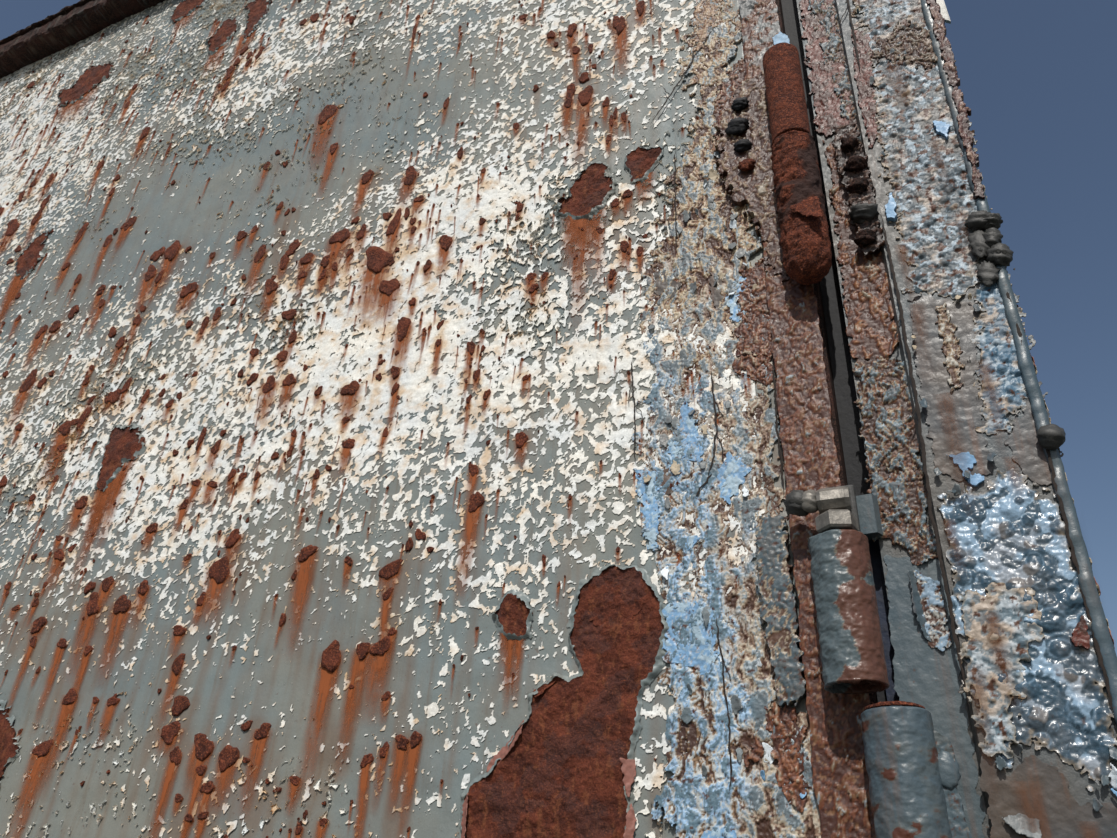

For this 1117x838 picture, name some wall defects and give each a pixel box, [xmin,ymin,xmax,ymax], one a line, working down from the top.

corrosion [169,0,359,107]
corrosion [391,0,434,77]
corrosion [689,0,723,68]
corrosion [513,0,665,310]
corrosion [0,105,523,838]
peeling [0,0,821,838]
corrosion [514,358,531,390]
corrosion [507,429,539,458]
corrosion [459,547,669,838]